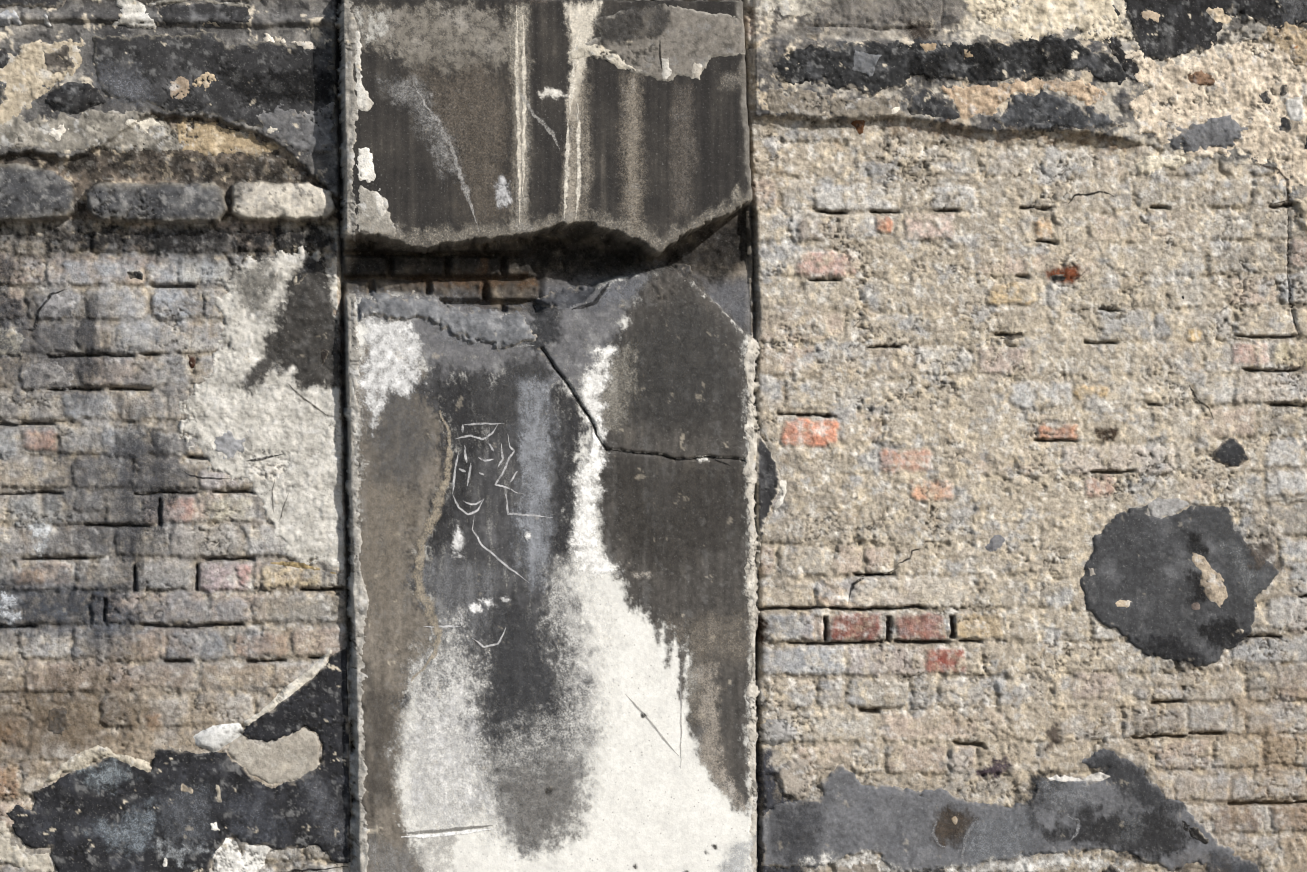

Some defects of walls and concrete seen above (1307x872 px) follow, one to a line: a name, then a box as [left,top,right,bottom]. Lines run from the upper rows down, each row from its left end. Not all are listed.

water stain [363,0,750,253]
peeling [0,0,535,872]
water stain [411,411,453,682]
water stain [496,301,560,384]
crack [541,348,744,466]
spalling [996,332,1023,343]
peeling [742,338,1279,872]